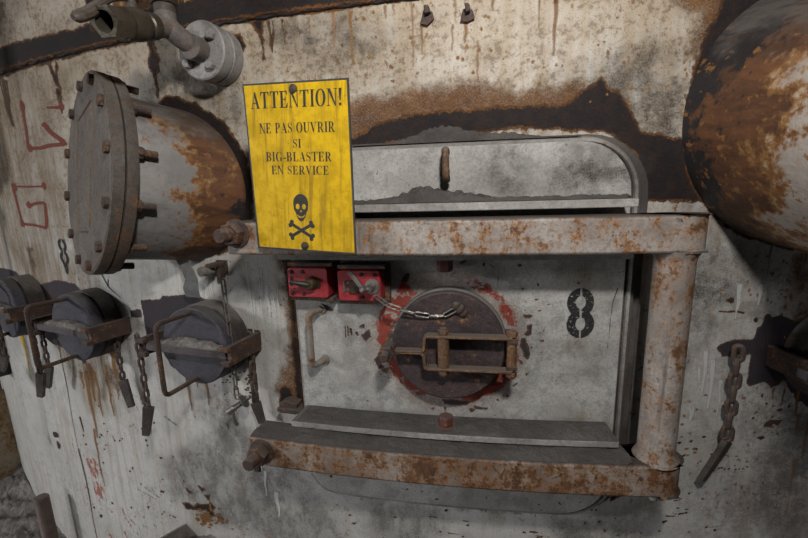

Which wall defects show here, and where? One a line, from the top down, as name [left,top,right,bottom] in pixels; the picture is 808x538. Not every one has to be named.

corrosion [553,0,563,67]
corrosion [673,0,721,54]
corrosion [350,69,585,137]
corrosion [79,352,119,486]
corrosion [754,389,808,480]
corrosion [195,503,233,529]